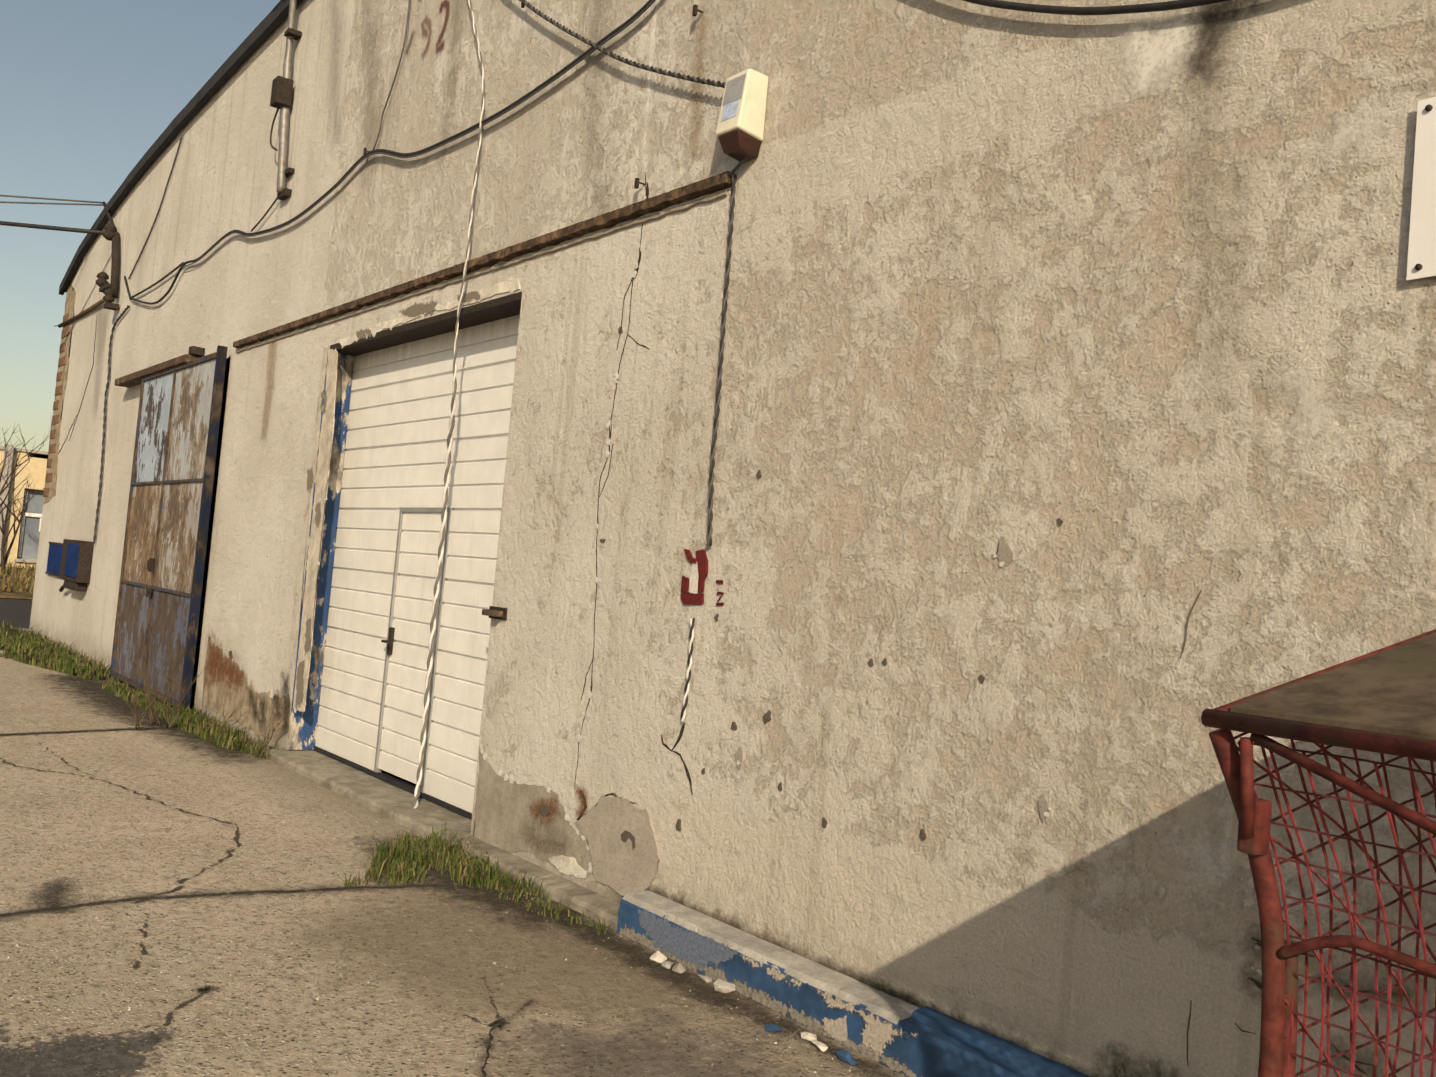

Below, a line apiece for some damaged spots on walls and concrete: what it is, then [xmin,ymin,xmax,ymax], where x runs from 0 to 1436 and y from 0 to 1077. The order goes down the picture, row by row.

leakage [1189,0,1258,72]
peeling [202,276,521,742]
crack [574,154,649,875]
rust [208,636,243,686]
crack [0,742,241,968]
flaking render [473,745,592,878]
leakage [0,1023,175,1077]
crack [150,991,206,1042]
crack [466,975,534,1077]
peeling [635,905,918,1060]